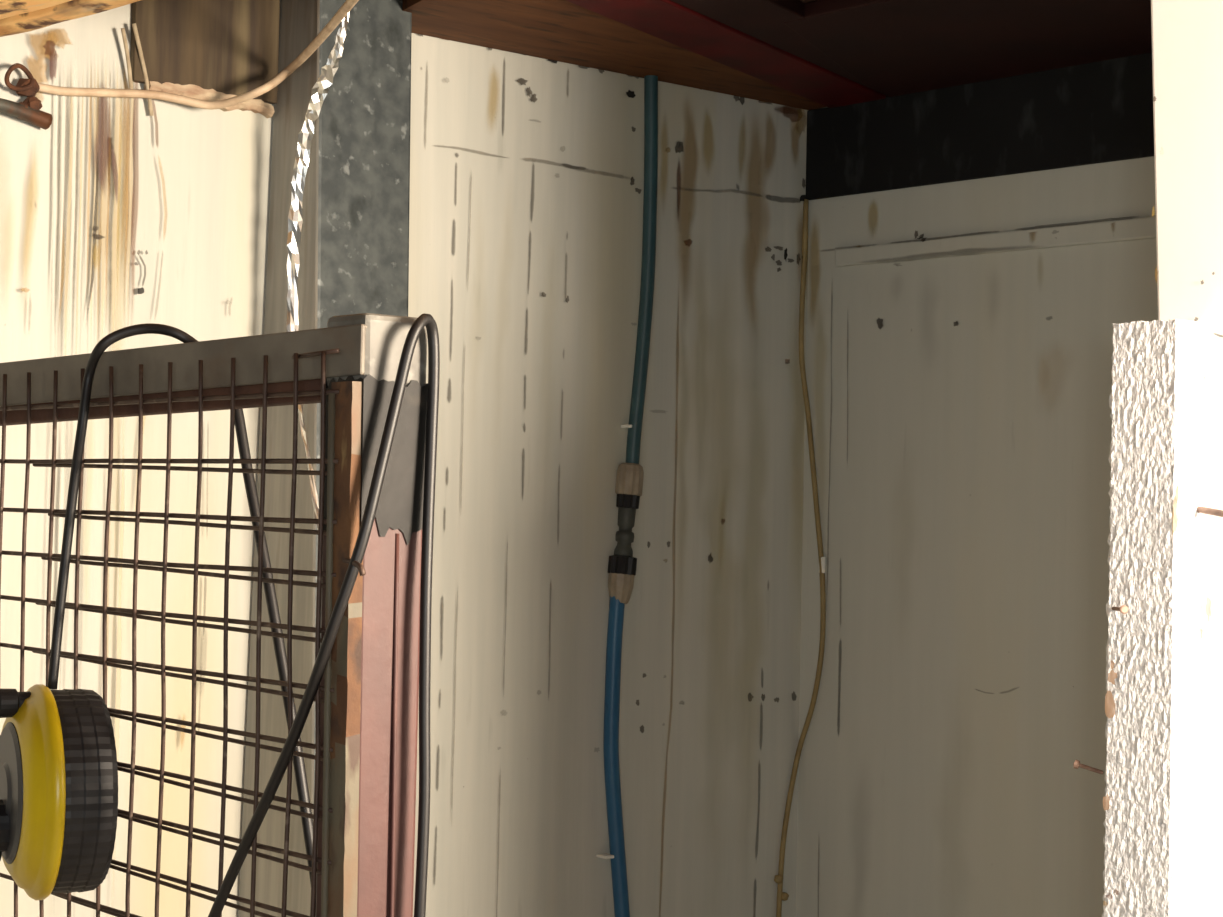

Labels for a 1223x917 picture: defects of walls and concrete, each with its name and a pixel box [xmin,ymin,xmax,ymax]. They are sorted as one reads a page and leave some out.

corrosion [28,30,71,83]
corrosion [776,106,803,122]
corrosion [87,82,138,324]
corrosion [675,141,683,212]